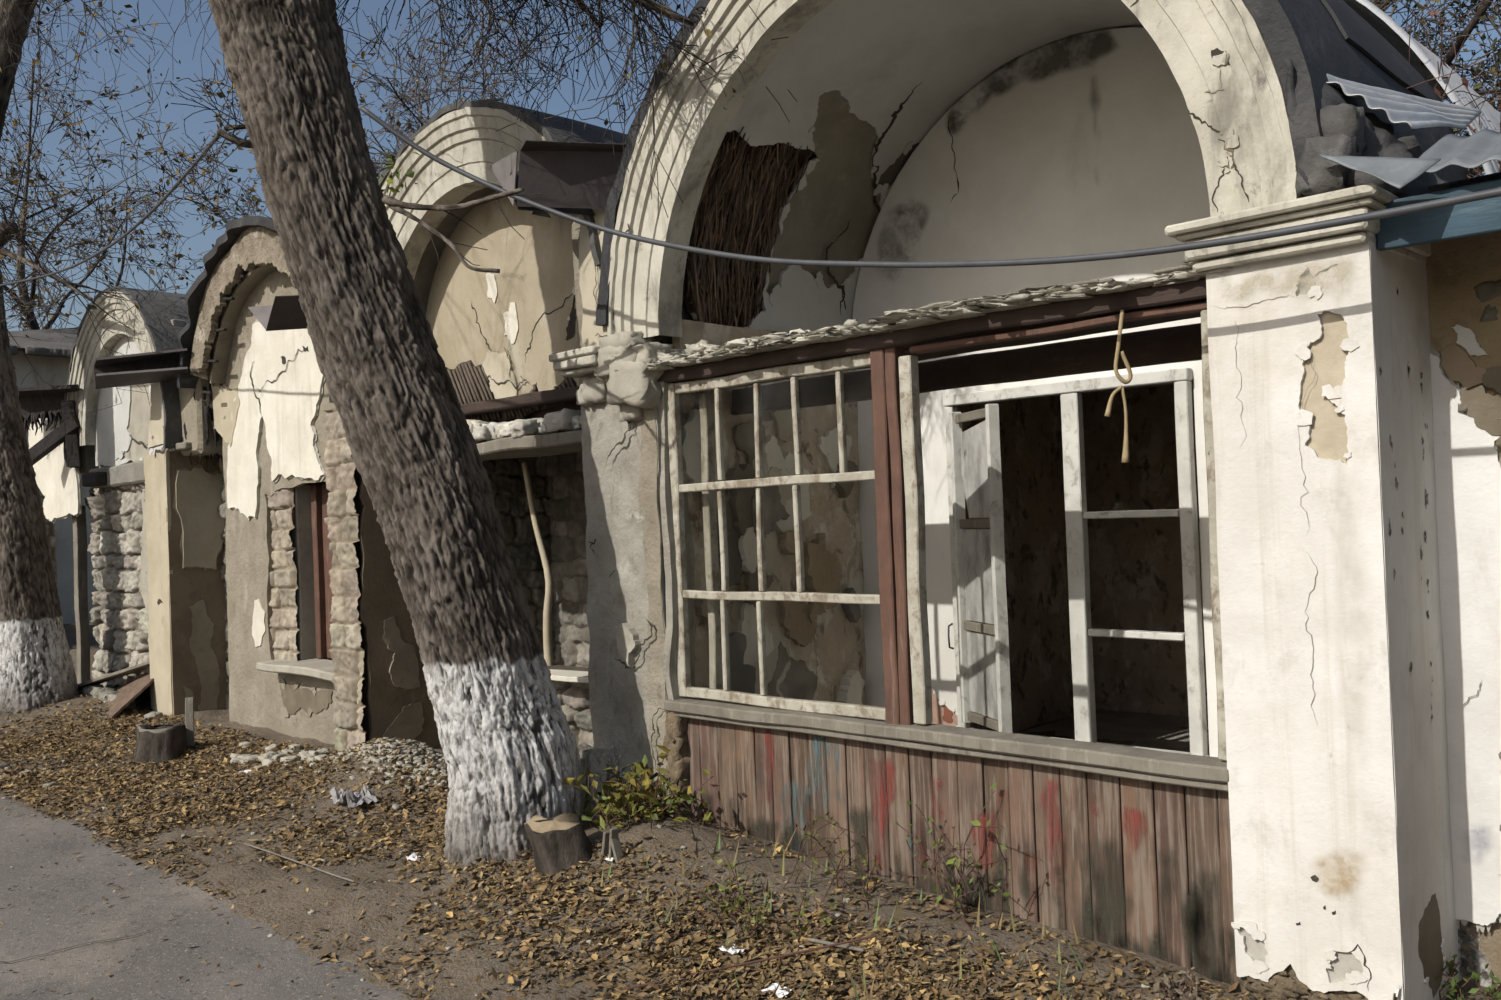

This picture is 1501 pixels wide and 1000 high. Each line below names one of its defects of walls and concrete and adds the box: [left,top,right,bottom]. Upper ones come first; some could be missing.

peeling [683,90,919,328]
crack [825,82,922,313]
crack [1188,68,1249,212]
peeling [172,231,326,571]
peeling [447,273,577,423]
crack [471,264,615,389]
peeling [1292,264,1359,463]
crack [1298,348,1318,717]
peeling [1418,232,1501,998]
spalling [1231,920,1372,1000]
peeling [1393,985,1402,1000]